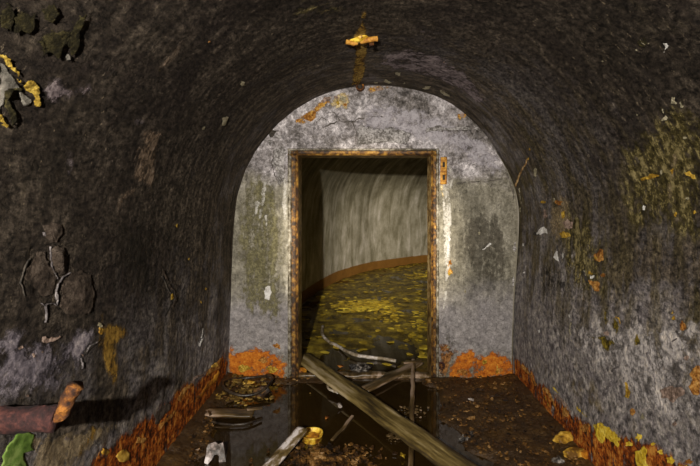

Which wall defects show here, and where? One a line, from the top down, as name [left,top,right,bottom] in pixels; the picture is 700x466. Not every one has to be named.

peeling [0,3,87,60]
corrosion [351,12,367,85]
flaking render [0,55,42,128]
water stain [239,177,287,321]